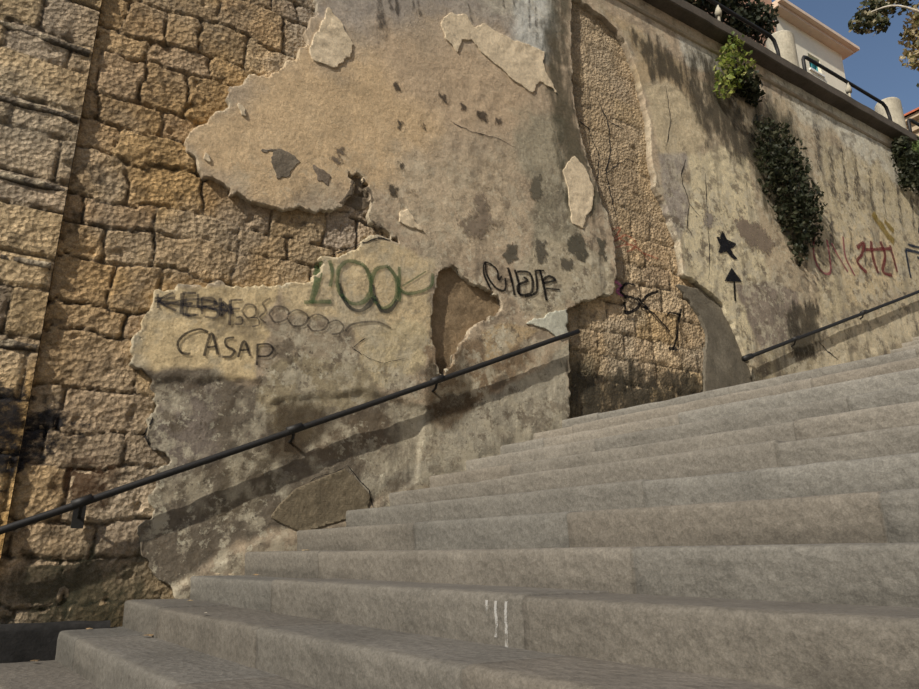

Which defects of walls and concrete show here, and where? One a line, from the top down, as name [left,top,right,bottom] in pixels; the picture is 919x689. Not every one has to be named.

damp [376,0,399,28]
peeling [441,12,557,93]
spalling [459,103,502,125]
crack [581,97,634,235]
spalling [456,194,496,243]
spalling [502,242,519,264]
flaking render [526,1,705,419]
flaking render [0,0,396,627]
spalling [431,267,500,370]
damp [567,360,703,417]